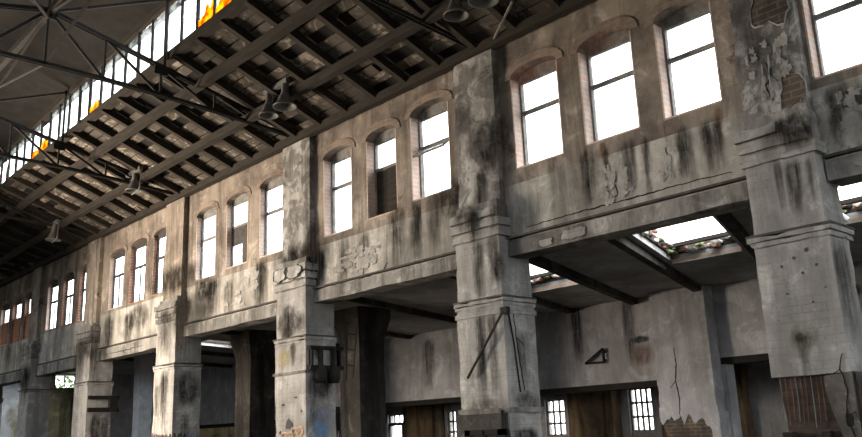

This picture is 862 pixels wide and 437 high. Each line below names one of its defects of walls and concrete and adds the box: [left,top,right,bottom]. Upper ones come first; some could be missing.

spalling [745,0,808,113]
damp [622,140,649,183]
damp [677,129,690,174]
damp [702,122,721,158]
damp [477,172,486,203]
damp [307,224,324,283]
damp [468,213,497,288]
damp [159,305,189,354]
damp [155,373,167,420]
crack [670,347,680,414]
crack [827,353,861,437]